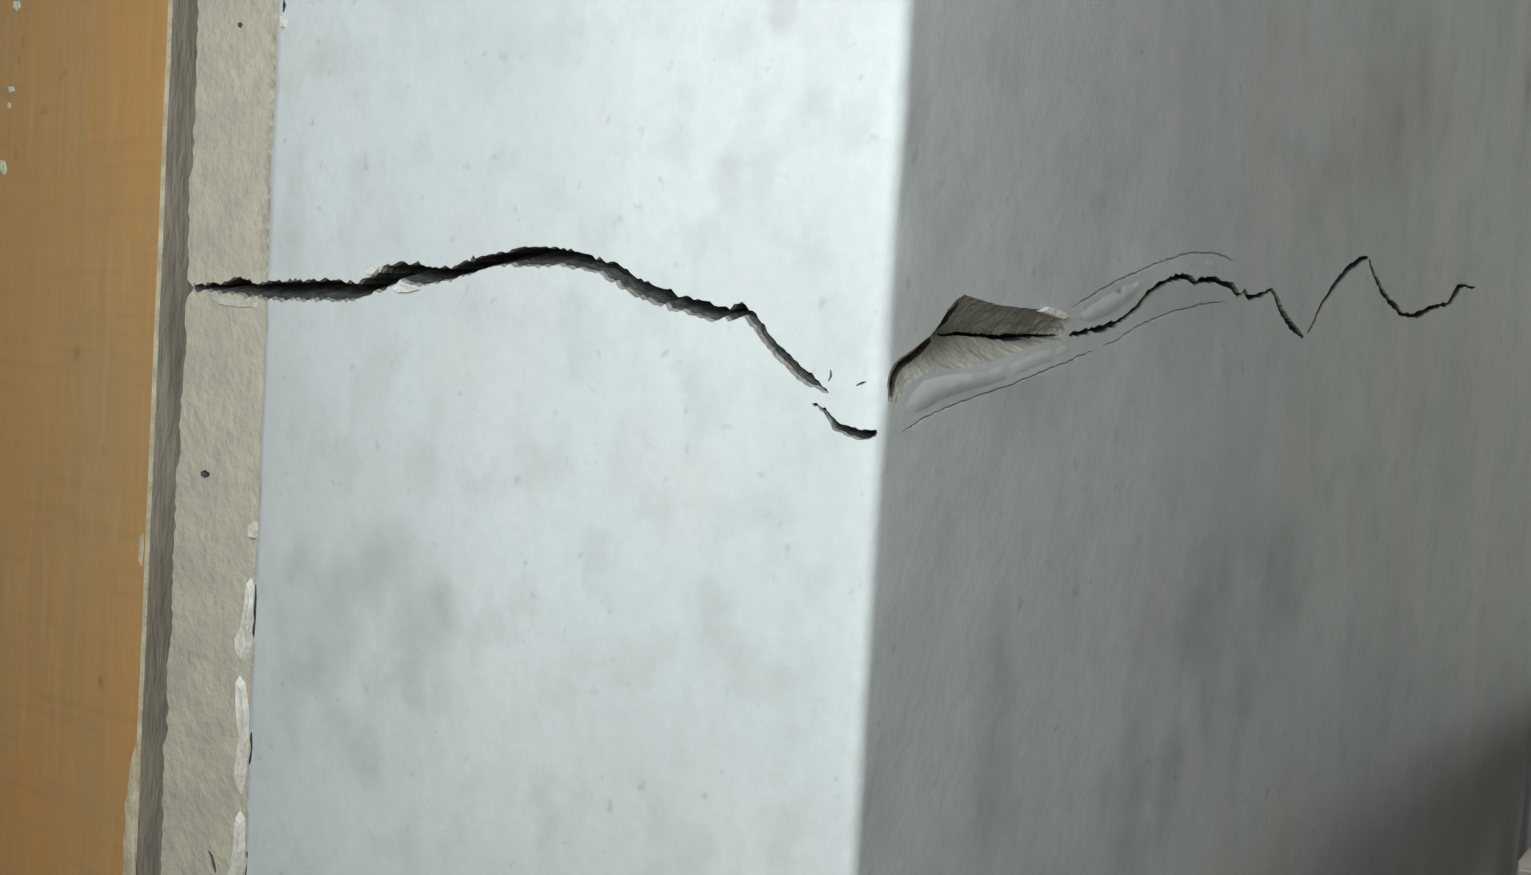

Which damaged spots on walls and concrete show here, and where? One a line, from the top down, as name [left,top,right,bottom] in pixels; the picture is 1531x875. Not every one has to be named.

crack [193,246,1475,440]
flaking render [887,295,1069,403]